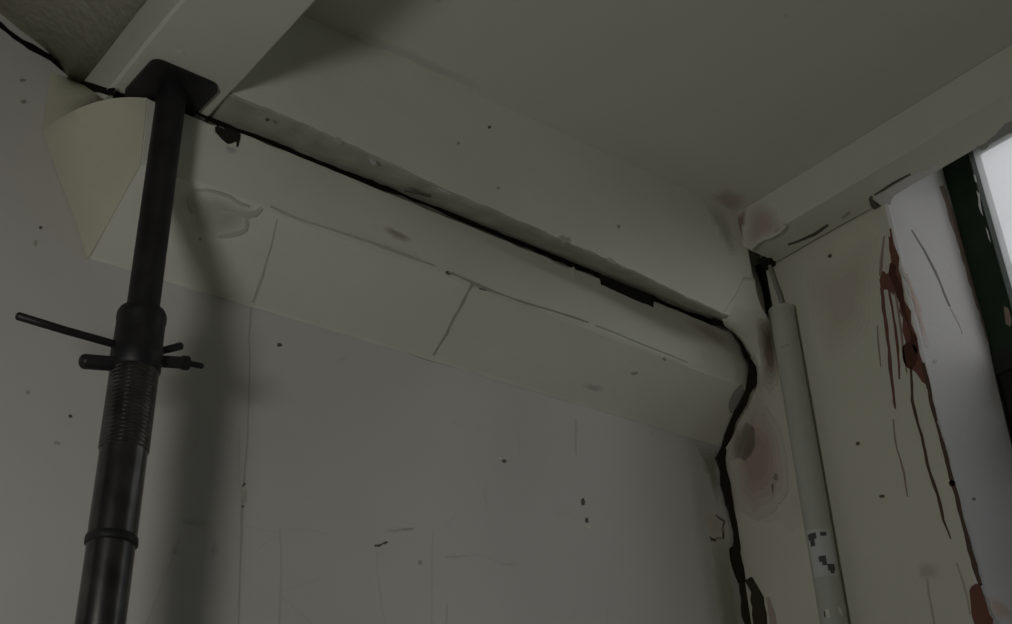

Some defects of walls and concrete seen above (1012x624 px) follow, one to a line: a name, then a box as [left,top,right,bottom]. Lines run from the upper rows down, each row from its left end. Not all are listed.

crack [0,21,126,98]
crack [197,113,600,278]
corrosion [877,228,926,409]
corrosion [939,186,989,344]
spalling [976,122,1012,151]
crack [187,189,688,624]
crack [652,296,767,624]
corrosion [956,563,993,624]